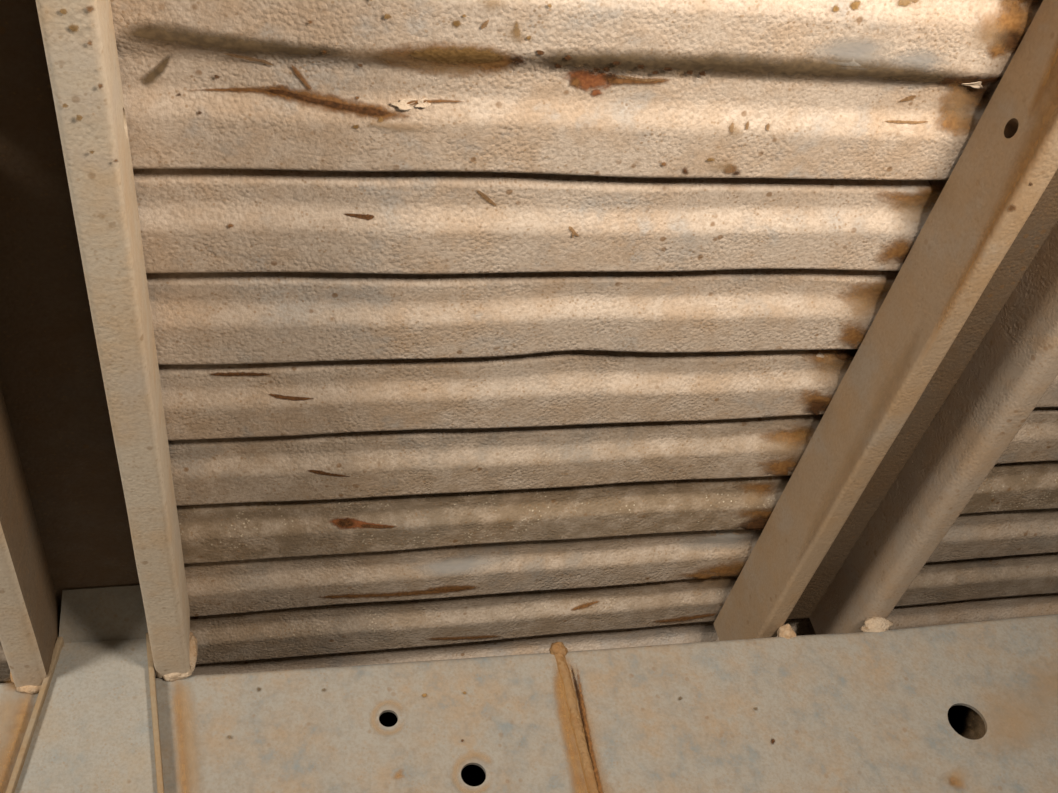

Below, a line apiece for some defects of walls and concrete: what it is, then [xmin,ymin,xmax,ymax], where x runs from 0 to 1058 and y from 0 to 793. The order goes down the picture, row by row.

corrosion [988,0,1043,57]
corrosion [569,70,669,96]
corrosion [937,46,1058,330]
corrosion [813,326,865,370]
corrosion [804,392,833,415]
corrosion [746,430,809,495]
corrosion [331,518,395,529]
corrosion [738,510,773,530]
corrosion [324,585,475,598]
corrosion [558,674,603,793]